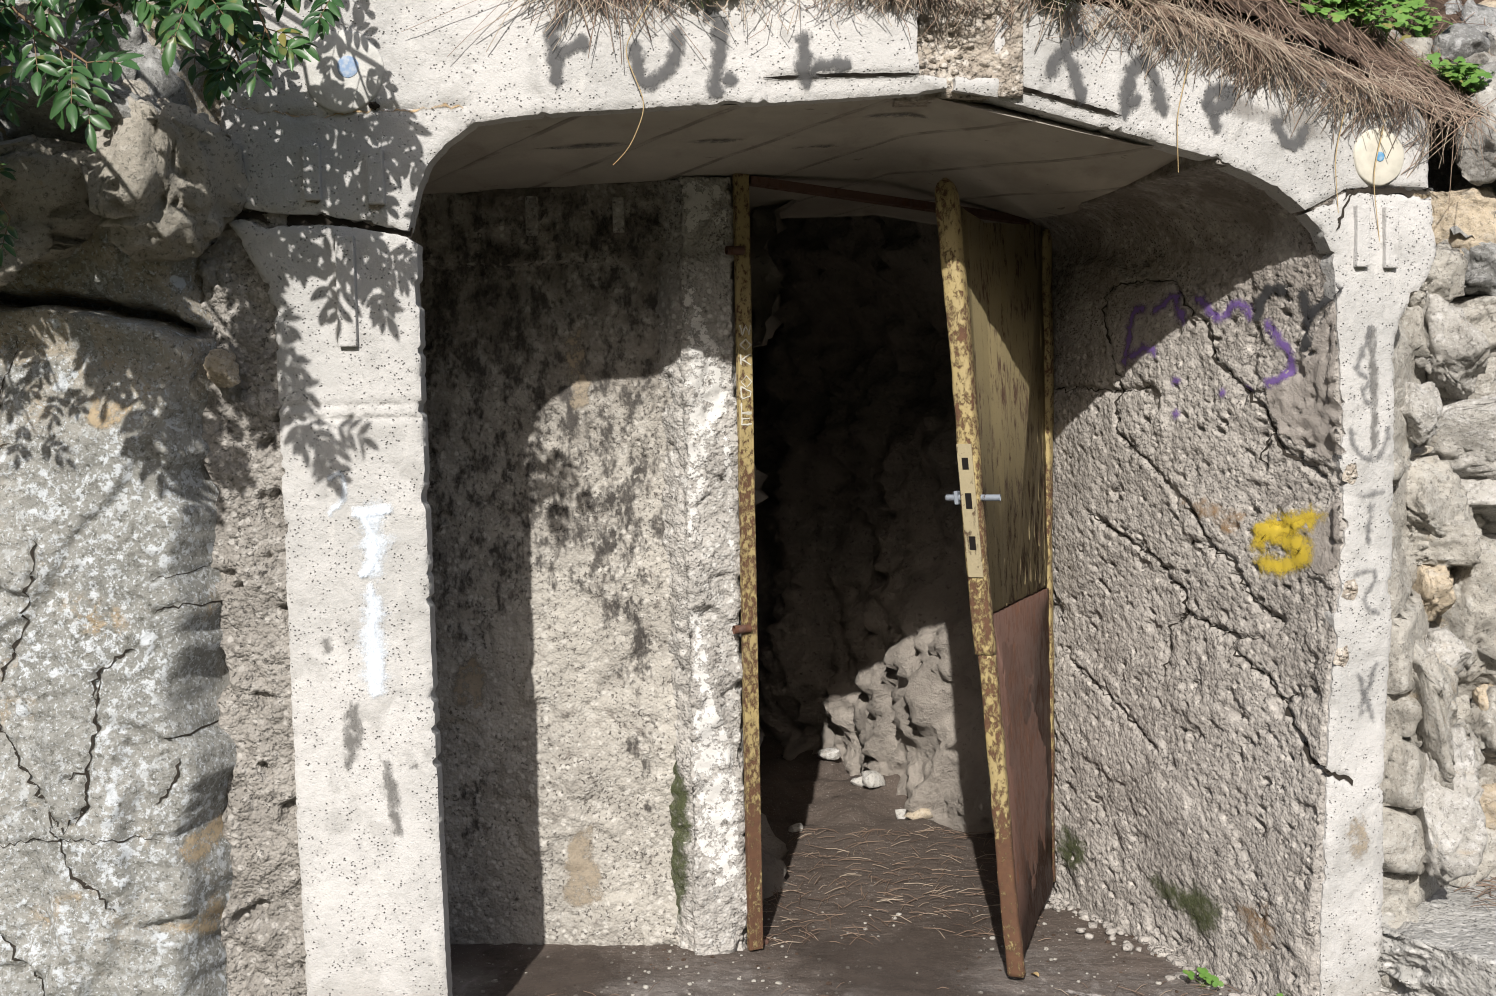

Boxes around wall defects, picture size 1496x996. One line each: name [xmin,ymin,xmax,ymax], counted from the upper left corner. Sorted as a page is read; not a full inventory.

crack [0,339,18,406]
water stain [421,185,669,690]
crack [0,537,38,682]
crack [153,565,223,615]
crack [1056,279,1353,786]
crack [0,649,219,912]
water stain [626,722,655,777]
crack [1,935,45,996]